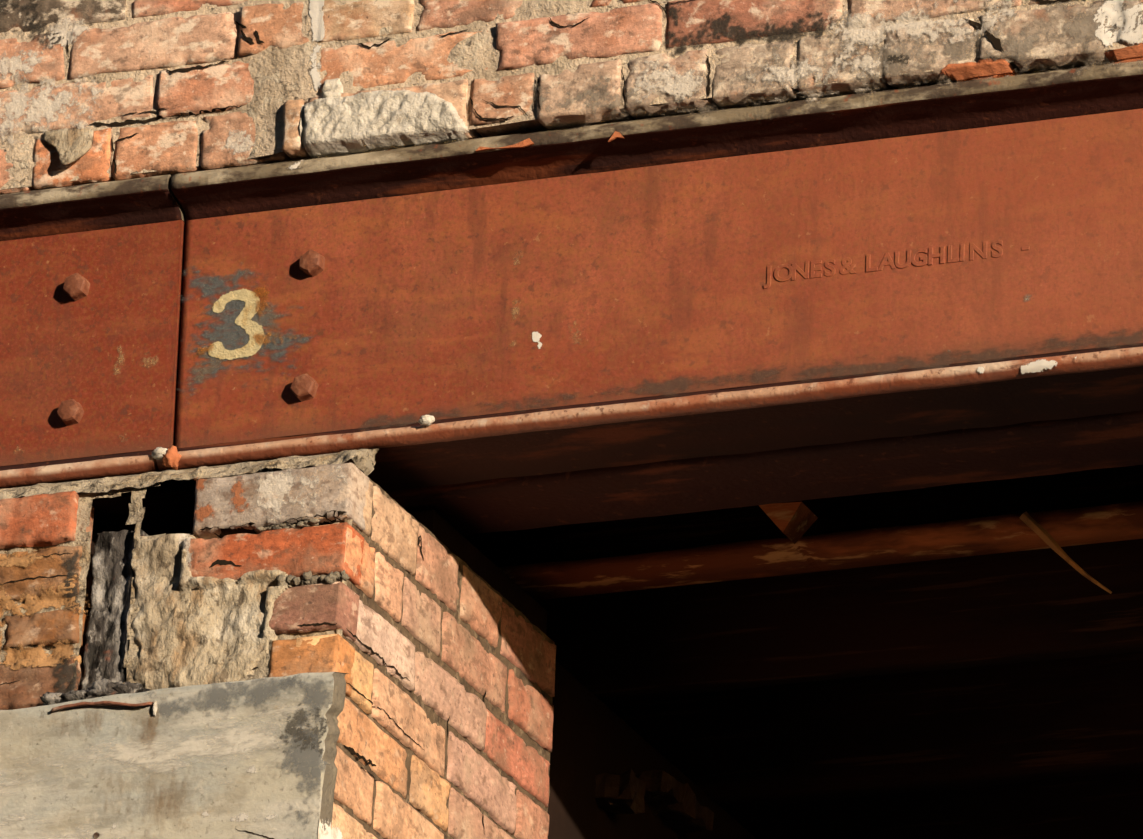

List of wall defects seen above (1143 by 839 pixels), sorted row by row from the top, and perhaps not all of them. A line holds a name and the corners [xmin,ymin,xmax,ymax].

peeling [152,608,185,650]